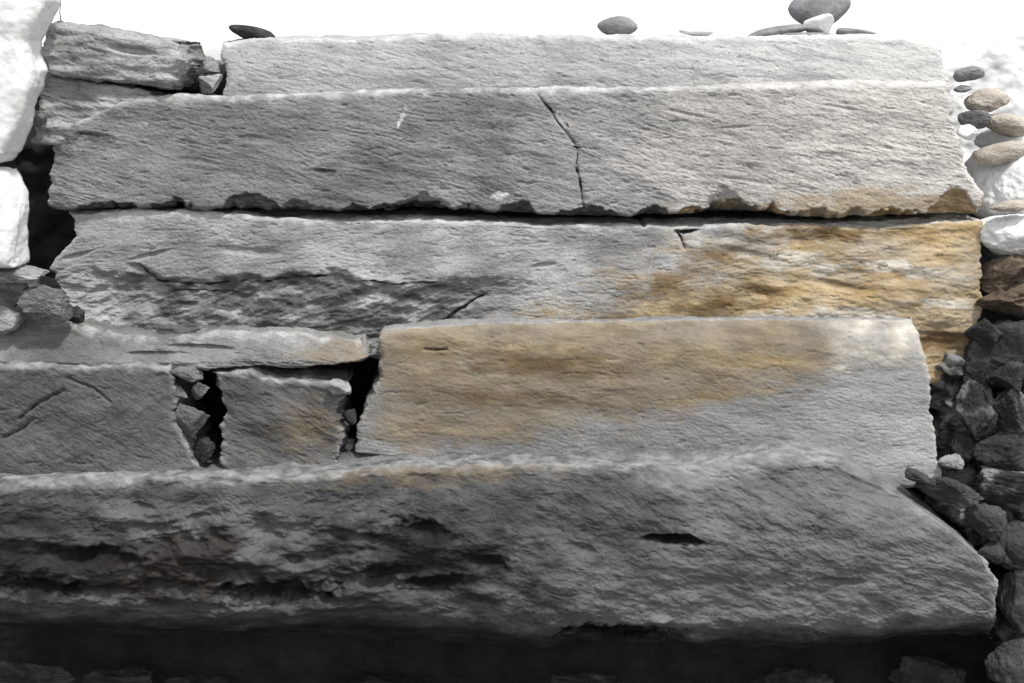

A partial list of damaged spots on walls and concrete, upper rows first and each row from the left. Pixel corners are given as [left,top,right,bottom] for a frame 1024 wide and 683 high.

crack [540,98,601,206]
crack [446,294,485,319]